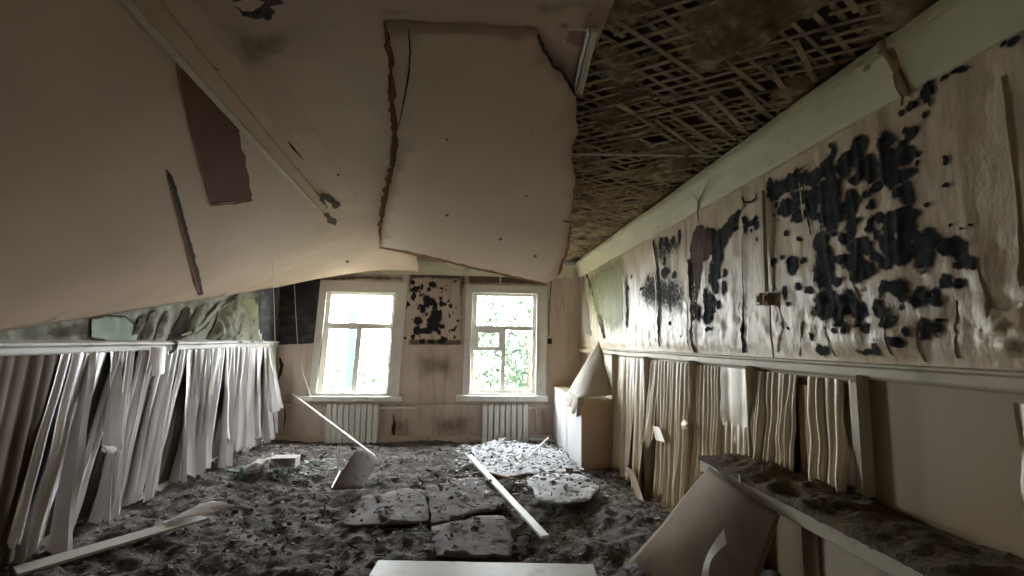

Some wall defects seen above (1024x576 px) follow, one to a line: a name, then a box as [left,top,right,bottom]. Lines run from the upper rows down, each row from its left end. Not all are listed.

water stain [1000,35,1020,48]
peeling [176,62,253,206]
water stain [627,66,977,357]
crack [166,169,239,341]
flaking render [50,298,264,343]
water stain [237,274,537,345]
peeling [625,465,646,507]